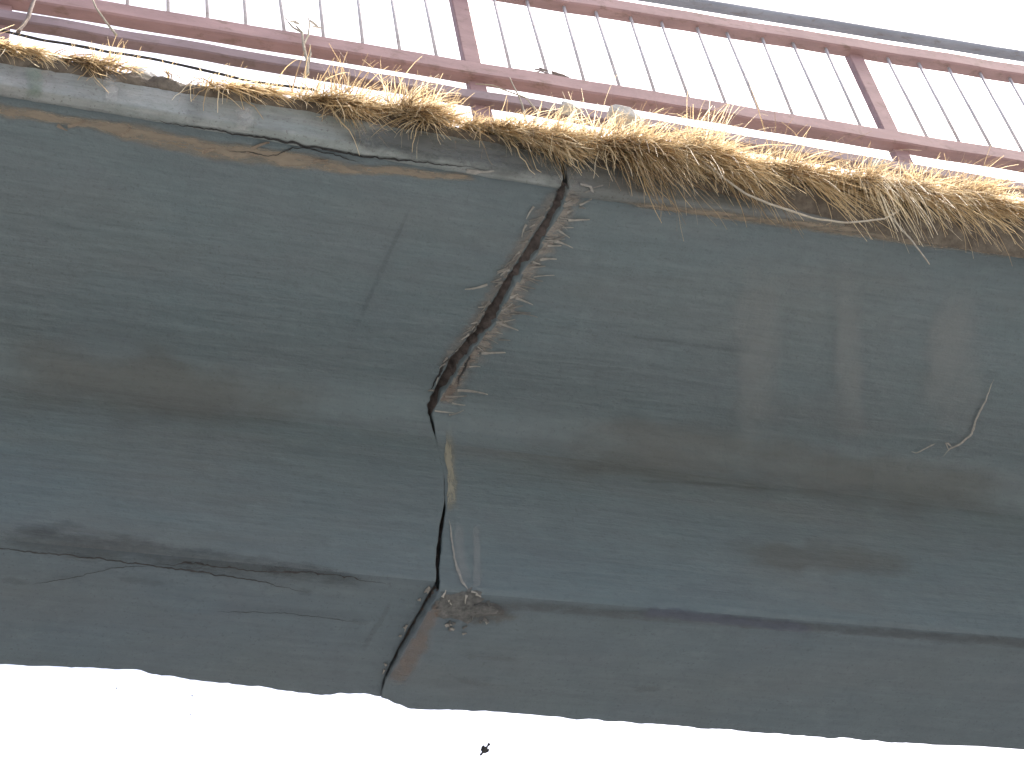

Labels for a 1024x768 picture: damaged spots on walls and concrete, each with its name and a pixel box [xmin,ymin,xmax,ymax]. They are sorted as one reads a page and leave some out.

crack [382,181,603,675]
crack [0,548,381,622]
spalling [431,587,504,635]